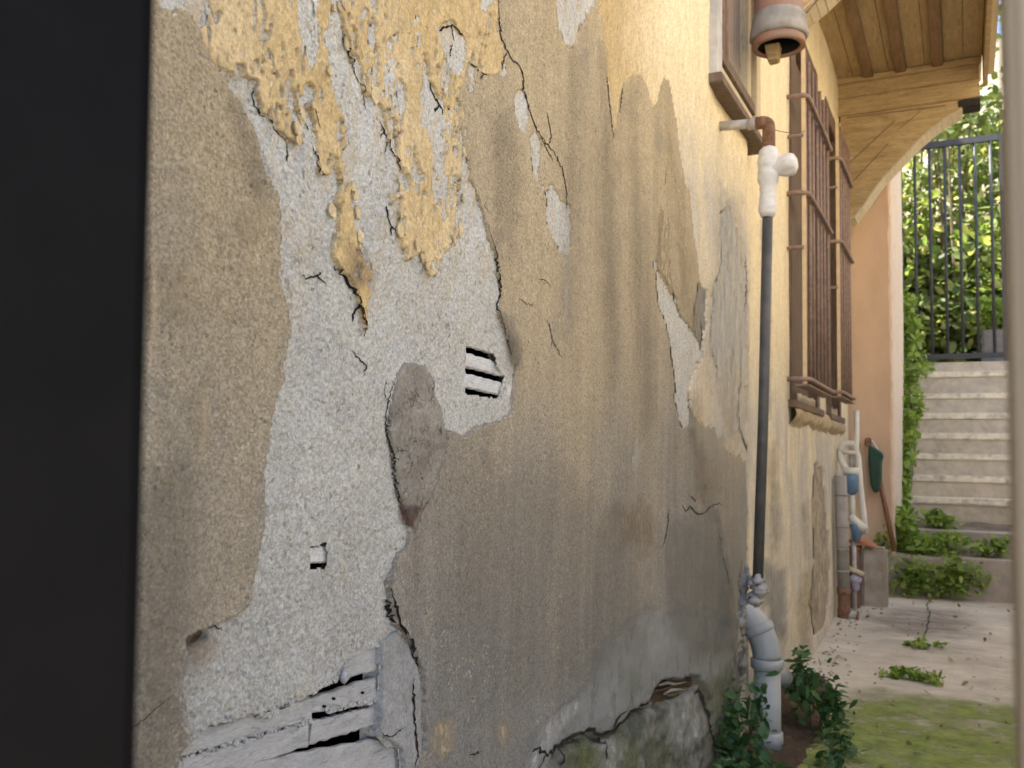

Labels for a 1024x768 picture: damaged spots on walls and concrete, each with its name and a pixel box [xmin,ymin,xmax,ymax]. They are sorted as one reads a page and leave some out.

crack [439,0,568,208]
crack [303,266,402,512]
peeling [135,0,748,768]
crack [662,484,742,596]
crack [381,588,420,767]
crack [533,697,653,768]
damp [532,608,737,768]
crack [691,684,717,749]